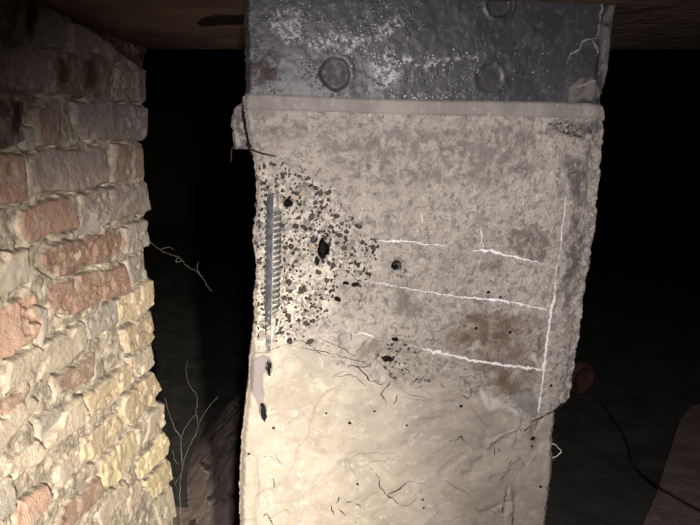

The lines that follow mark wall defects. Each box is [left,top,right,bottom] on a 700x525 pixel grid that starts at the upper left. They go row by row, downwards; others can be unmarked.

leakage [266,0,467,97]
spalling [230,96,382,376]
crack [293,337,472,403]
crack [520,401,568,432]
crack [342,452,425,504]
crack [431,429,525,482]